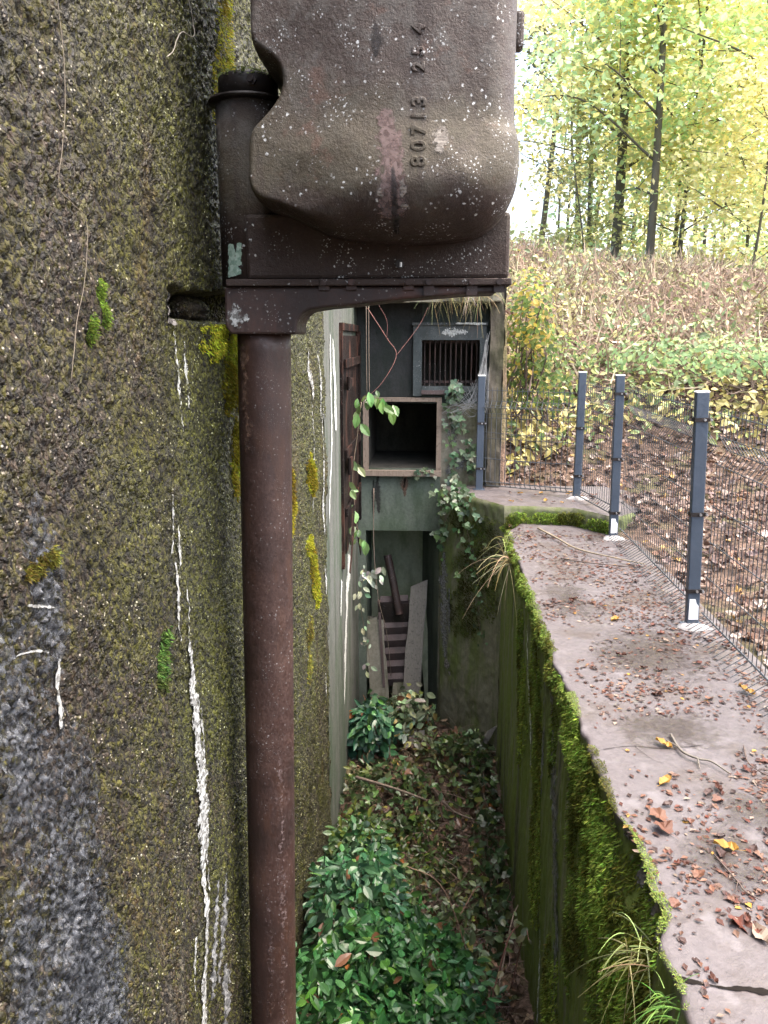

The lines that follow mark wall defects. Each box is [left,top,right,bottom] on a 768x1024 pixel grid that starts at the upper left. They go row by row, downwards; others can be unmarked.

rust [372,23,383,56]
rust [375,108,408,234]
damp [307,337,337,532]
damp [341,555,351,703]
damp [171,499,210,1024]
crack [671,975,768,995]